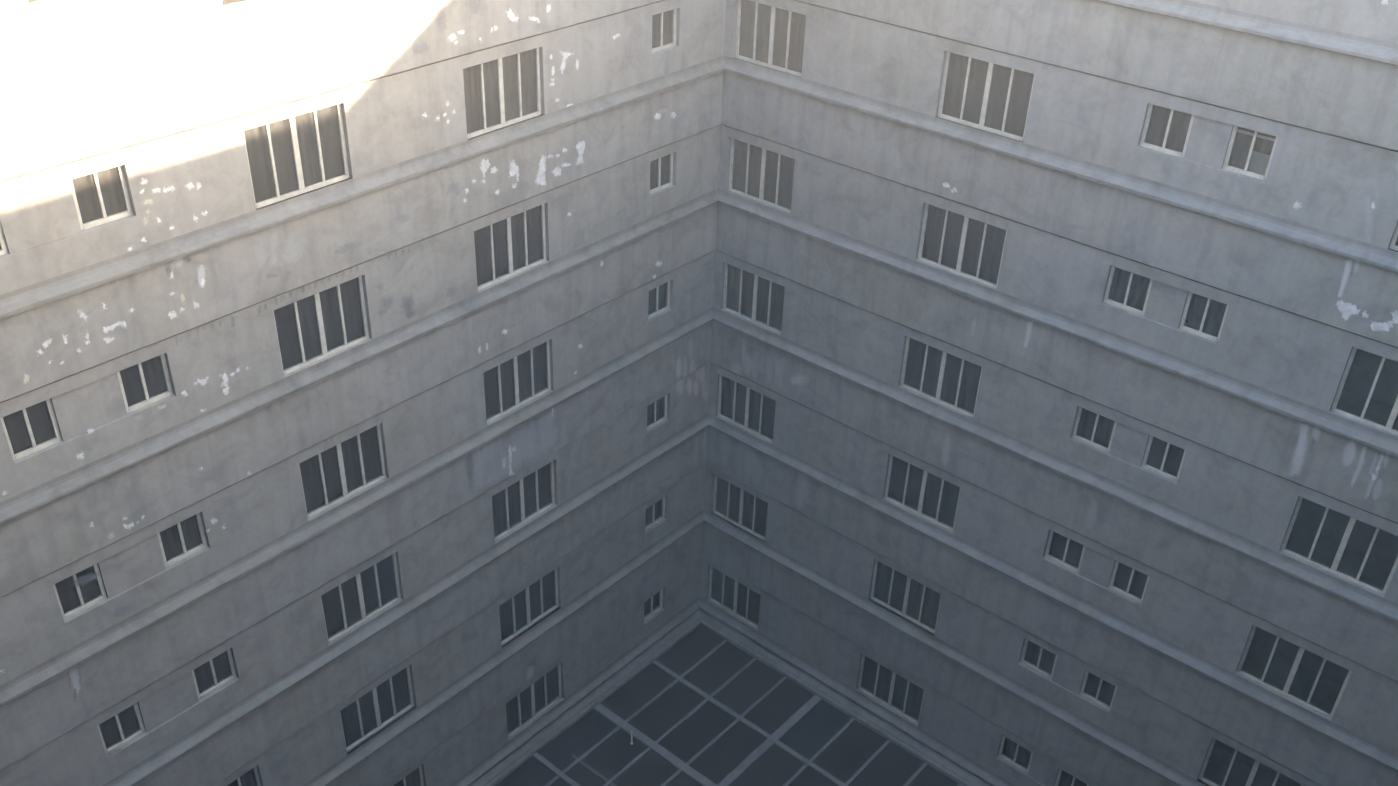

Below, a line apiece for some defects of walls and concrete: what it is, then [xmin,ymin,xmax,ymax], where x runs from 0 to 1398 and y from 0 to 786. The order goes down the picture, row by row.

peeling [447,4,551,46]
peeling [549,51,579,107]
peeling [463,141,585,203]
peeling [36,303,135,365]
peeling [168,260,205,319]
peeling [1336,300,1398,332]
leakage [1287,424,1322,477]
leakage [1340,440,1389,500]